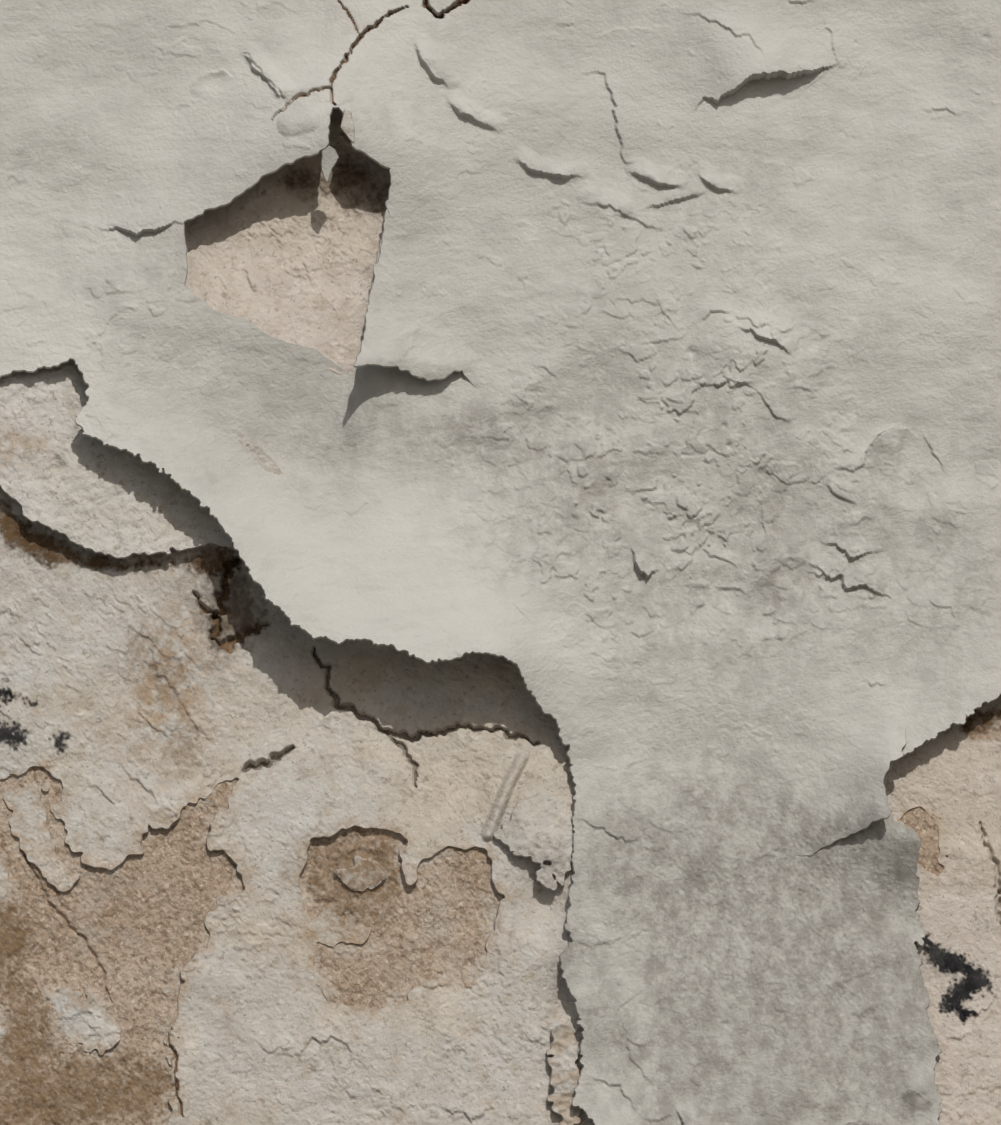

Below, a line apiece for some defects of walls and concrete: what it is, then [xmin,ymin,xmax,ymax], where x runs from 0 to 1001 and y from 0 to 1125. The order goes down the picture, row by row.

crack [244,0,471,121]
peeling [70,79,523,407]
peeling [725,314,807,363]
crack [243,748,295,772]
peeling [0,279,733,1125]
crack [313,648,541,788]
peeling [763,644,1001,1125]